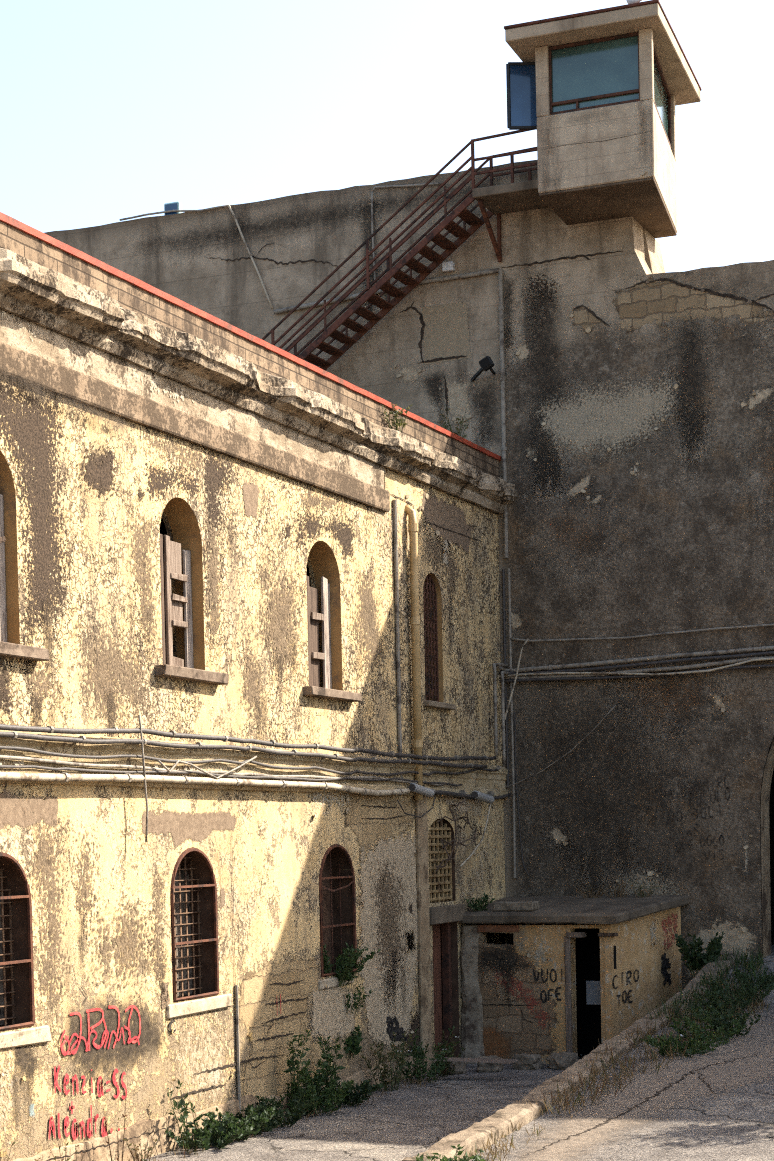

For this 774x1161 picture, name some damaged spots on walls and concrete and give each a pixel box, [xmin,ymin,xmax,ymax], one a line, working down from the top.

crack [210,242,343,267]
spalling [612,274,774,335]
crack [626,278,774,312]
peeling [128,363,197,403]
crack [400,302,466,412]
spalling [569,476,601,503]
water stain [0,371,260,737]
spalling [164,792,418,1115]
water stain [369,853,410,1009]
spalling [460,926,559,1064]
water stain [406,1012,420,1057]